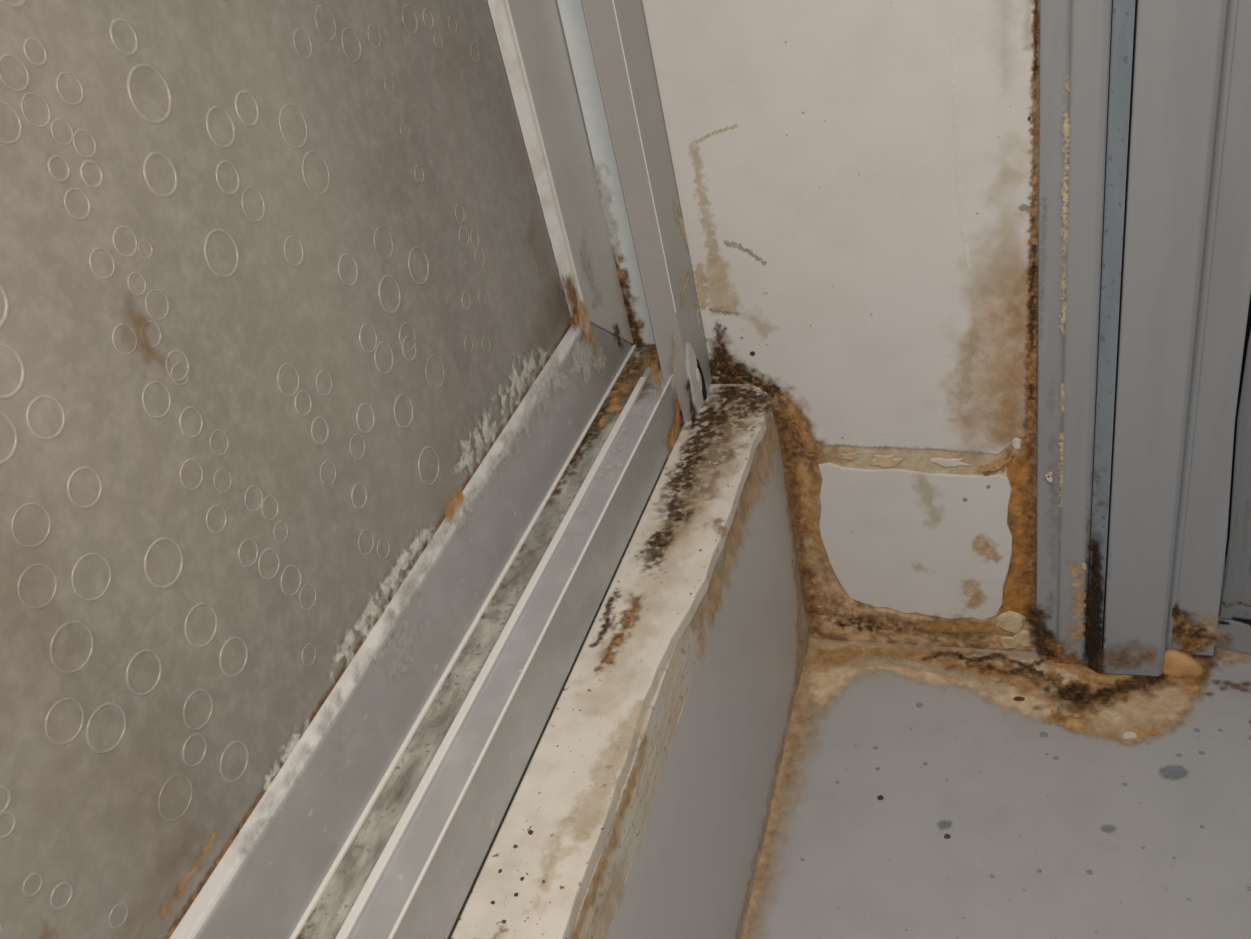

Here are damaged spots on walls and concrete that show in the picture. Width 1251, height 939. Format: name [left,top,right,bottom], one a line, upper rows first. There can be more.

leakage [692,125,766,314]
leakage [693,415,1081,939]
leakage [573,736,647,939]